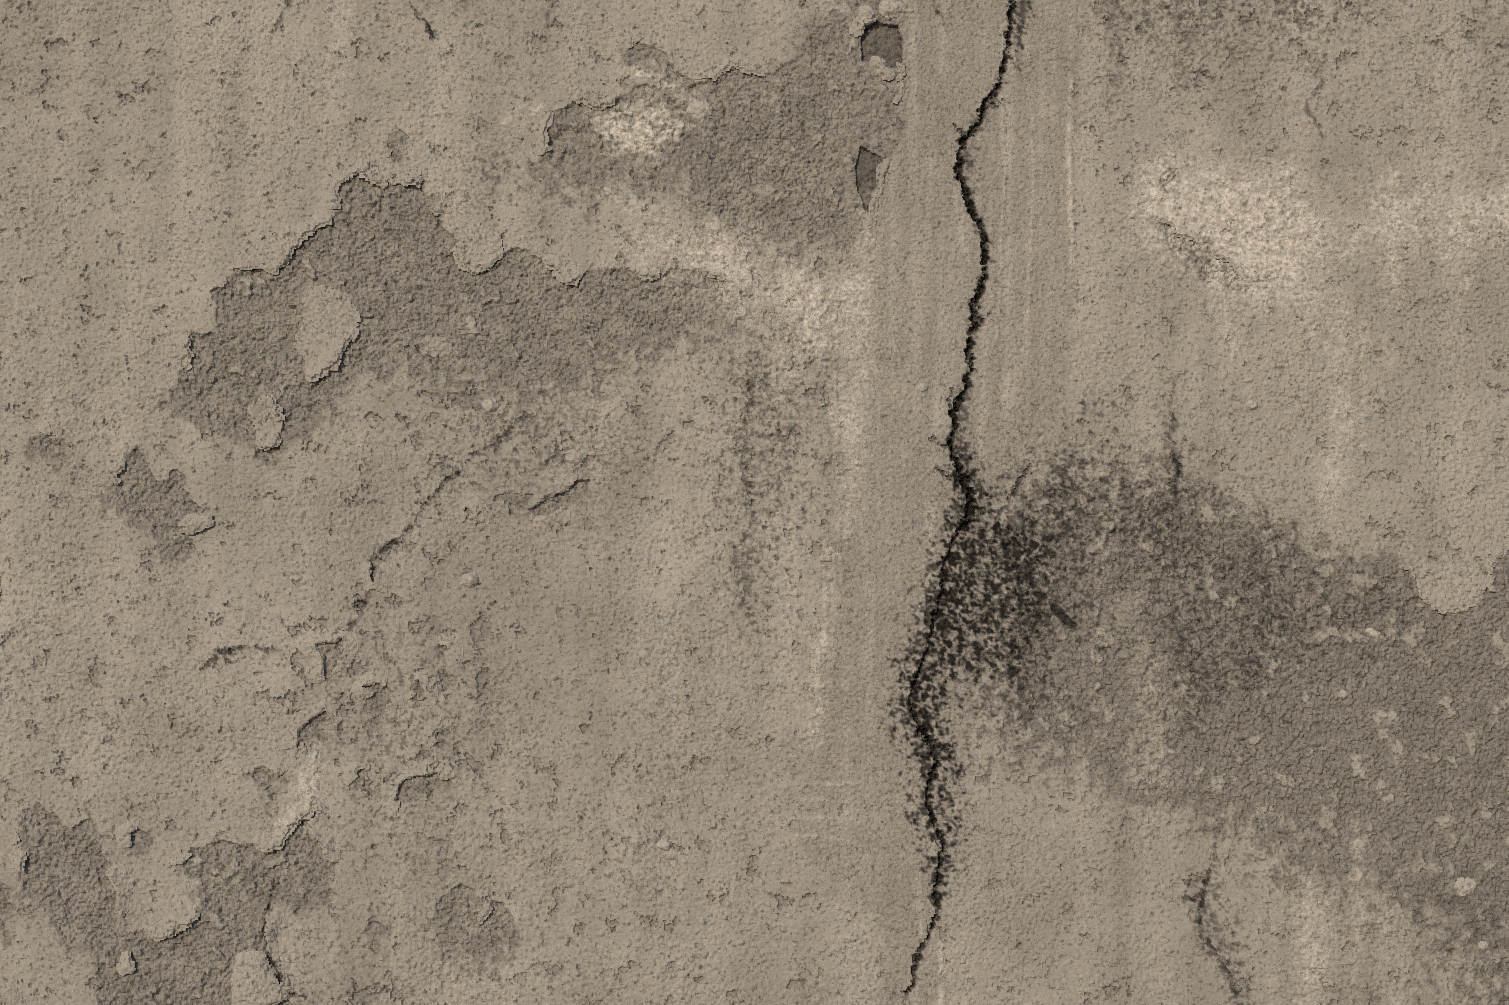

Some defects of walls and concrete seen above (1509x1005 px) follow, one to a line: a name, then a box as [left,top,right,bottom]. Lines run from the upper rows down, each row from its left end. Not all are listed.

peeling [157,0,908,465]
crack [910,0,1016,698]
peeling [0,628,464,1005]
crack [904,732,943,993]
mould [887,432,1055,909]